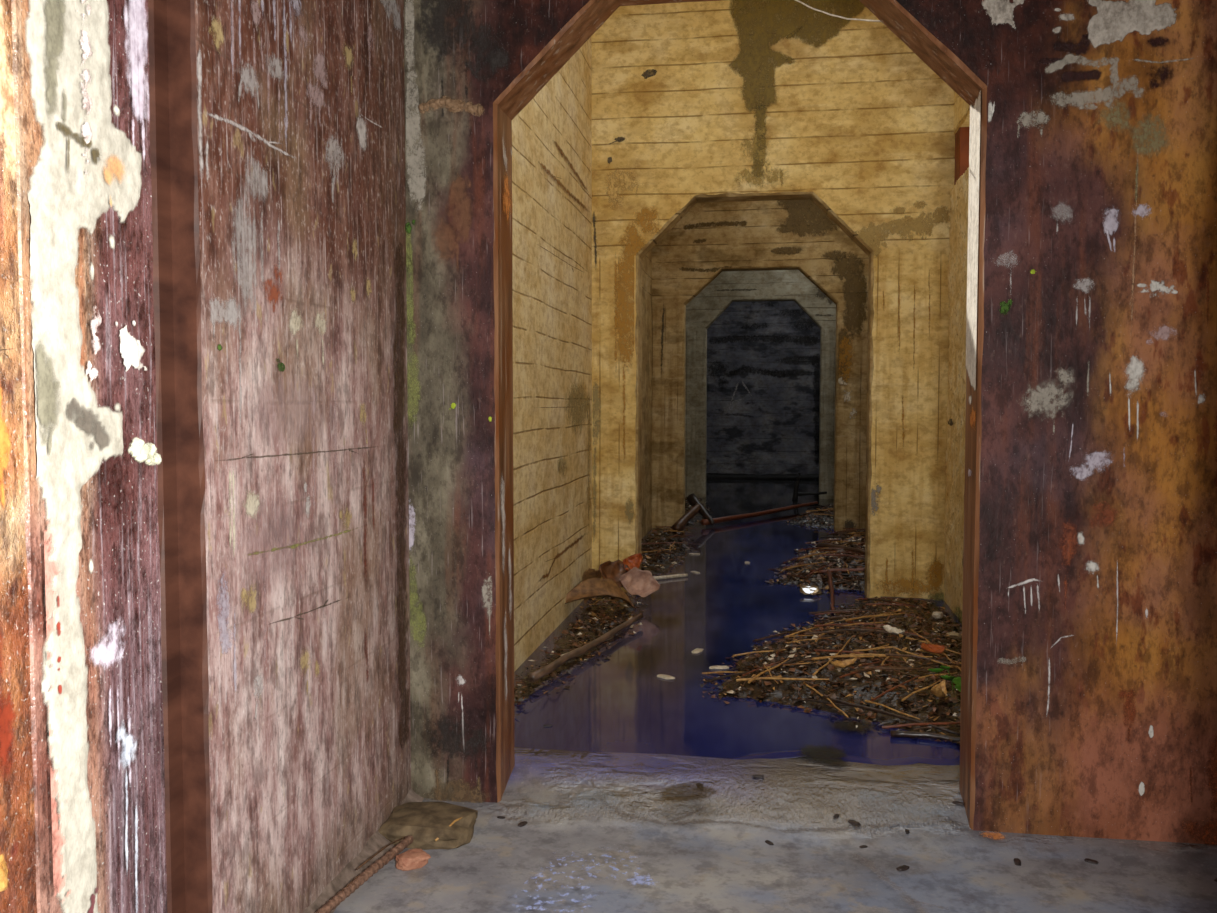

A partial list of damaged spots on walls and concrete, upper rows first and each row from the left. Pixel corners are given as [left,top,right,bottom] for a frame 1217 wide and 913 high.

leakage [729,0,865,186]
peeling [982,0,1024,27]
peeling [1053,8,1074,33]
rust [1039,34,1101,82]
peeling [1088,0,1176,48]
rust [1148,37,1169,47]
rust [1150,65,1173,88]
leakage [684,221,747,243]
peeling [116,321,147,371]
leakage [614,209,659,458]
leakage [708,199,950,464]
peeling [26,0,142,913]